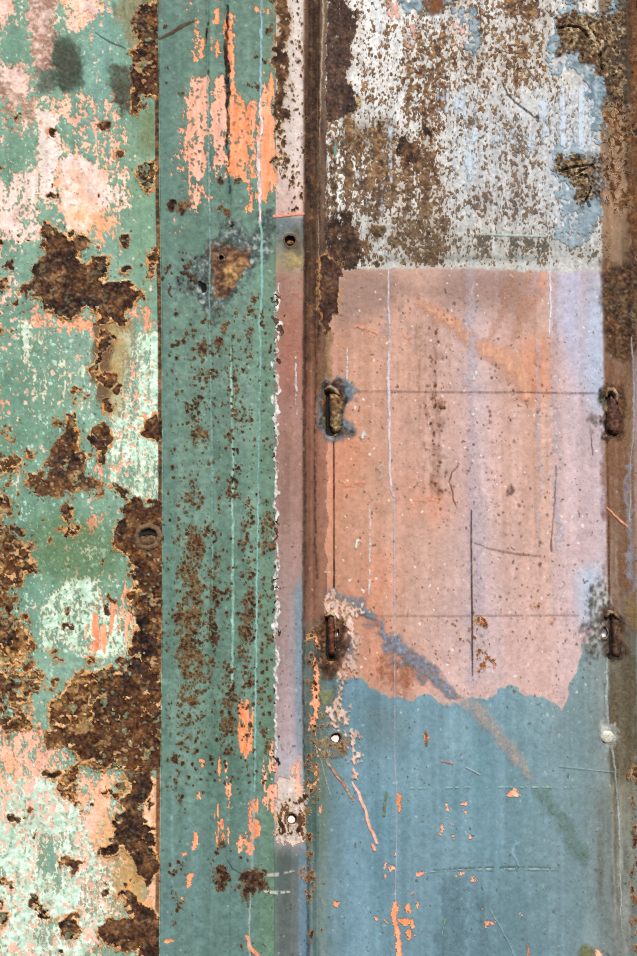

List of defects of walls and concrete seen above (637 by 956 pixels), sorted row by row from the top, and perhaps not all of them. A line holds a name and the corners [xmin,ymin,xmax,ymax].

peeling [0,0,132,258]
peeling [171,2,304,317]
peeling [0,269,98,410]
peeling [91,302,162,501]
corrosion [319,362,354,438]
corrosion [589,383,633,518]
peeling [0,711,129,956]
peeling [142,776,160,852]
corrosion [273,613,353,903]
corrosion [445,616,497,673]
corrosion [601,608,637,784]
corrosion [627,796,637,952]